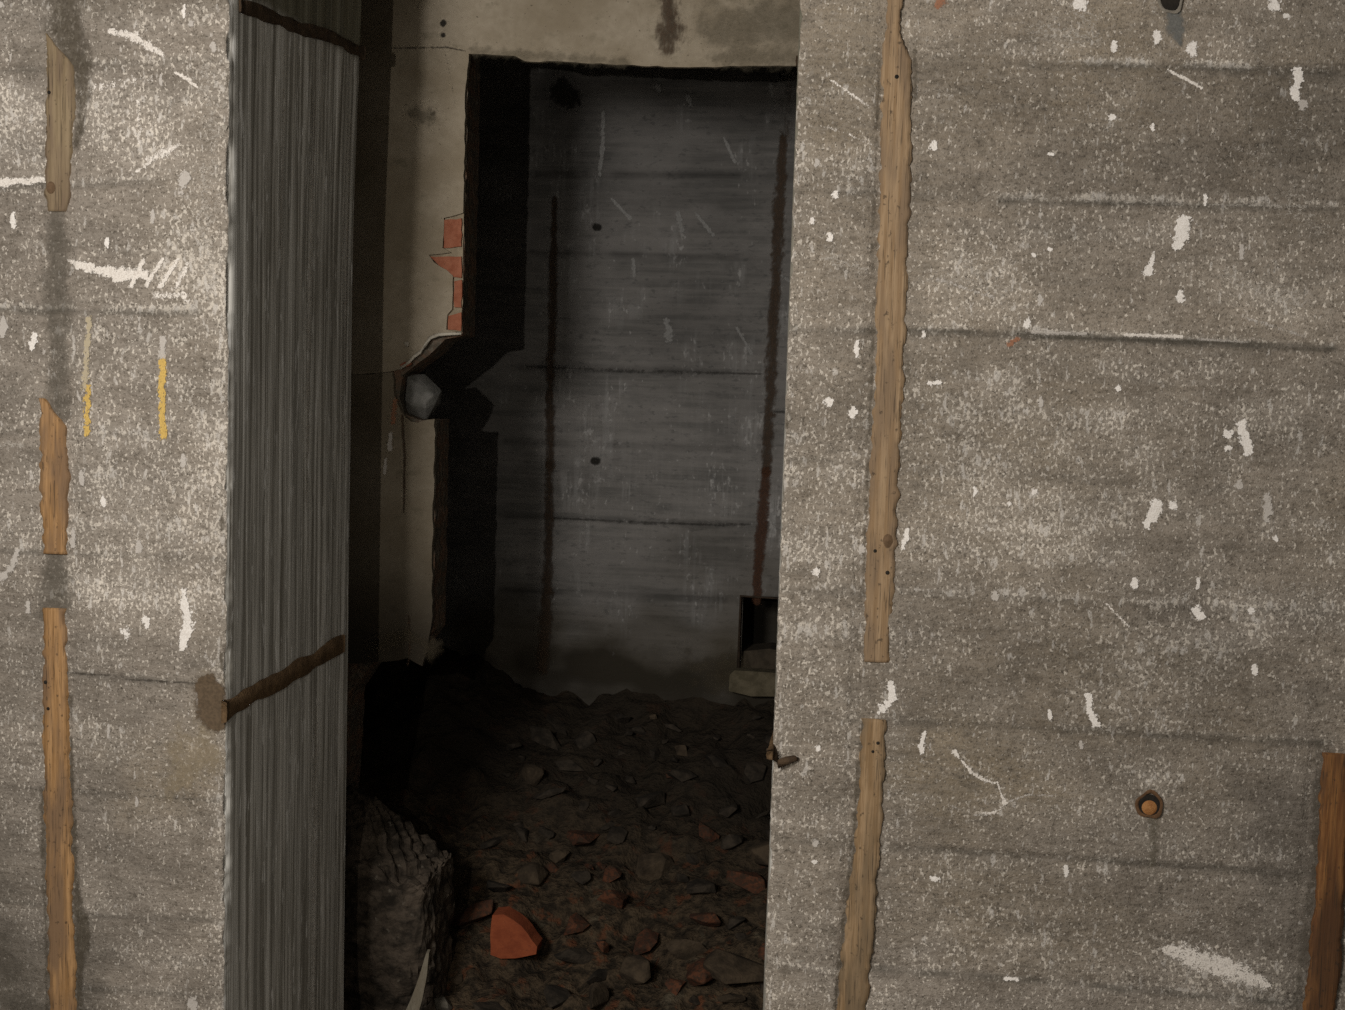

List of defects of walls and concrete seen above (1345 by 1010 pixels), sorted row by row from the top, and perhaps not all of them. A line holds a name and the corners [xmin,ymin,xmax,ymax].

leakage [81,317,92,390]
spalling [383,213,465,474]
rust [537,196,558,673]
rust [753,135,787,605]
rust [195,673,226,731]